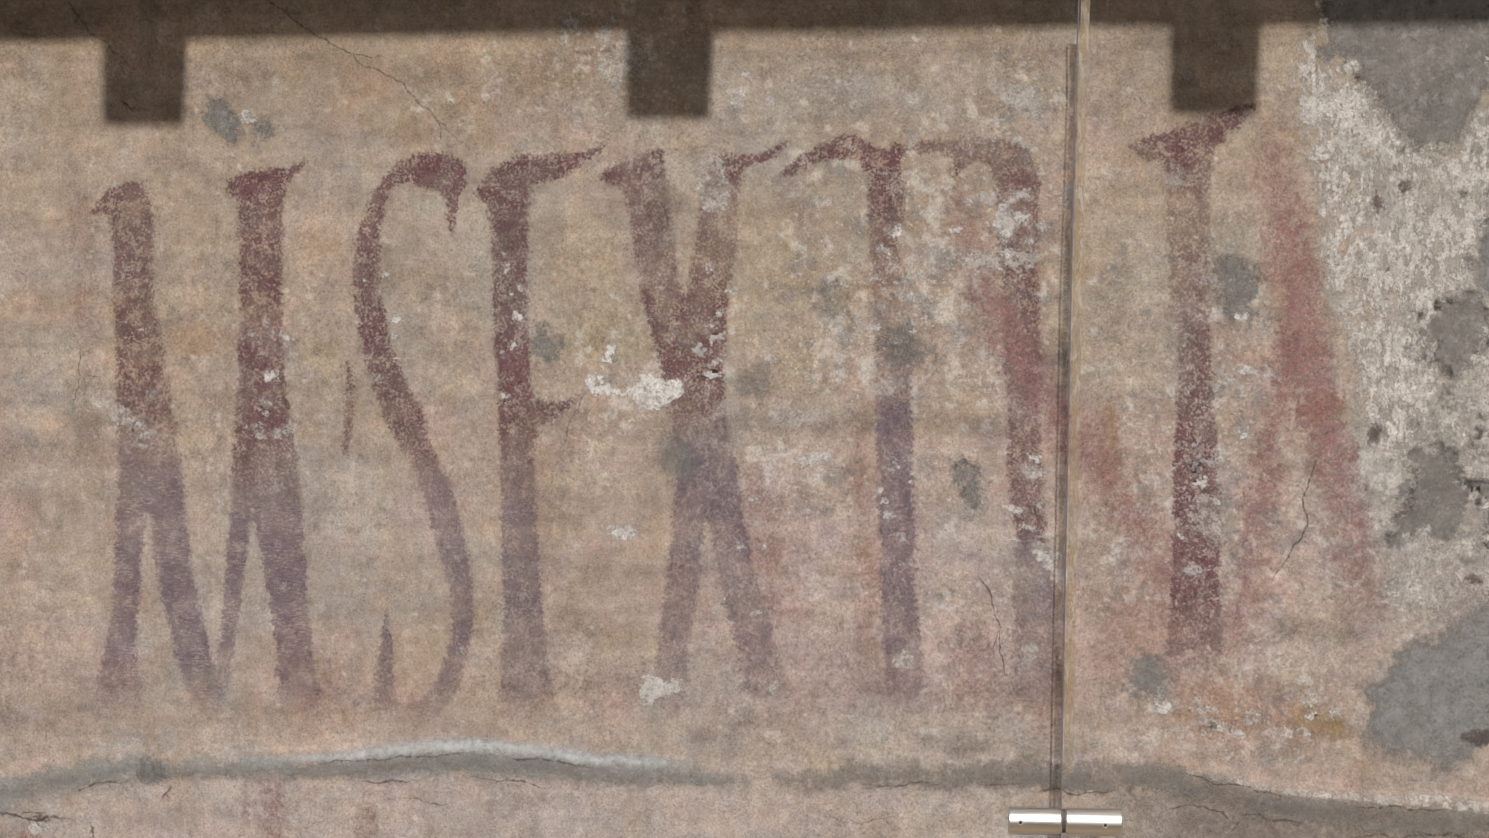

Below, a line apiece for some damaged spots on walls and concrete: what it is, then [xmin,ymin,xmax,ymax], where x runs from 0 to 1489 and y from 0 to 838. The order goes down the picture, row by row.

flaking render [584,344,684,411]
peeling [1289,0,1489,770]
crack [1285,471,1313,562]
crack [0,812,57,825]